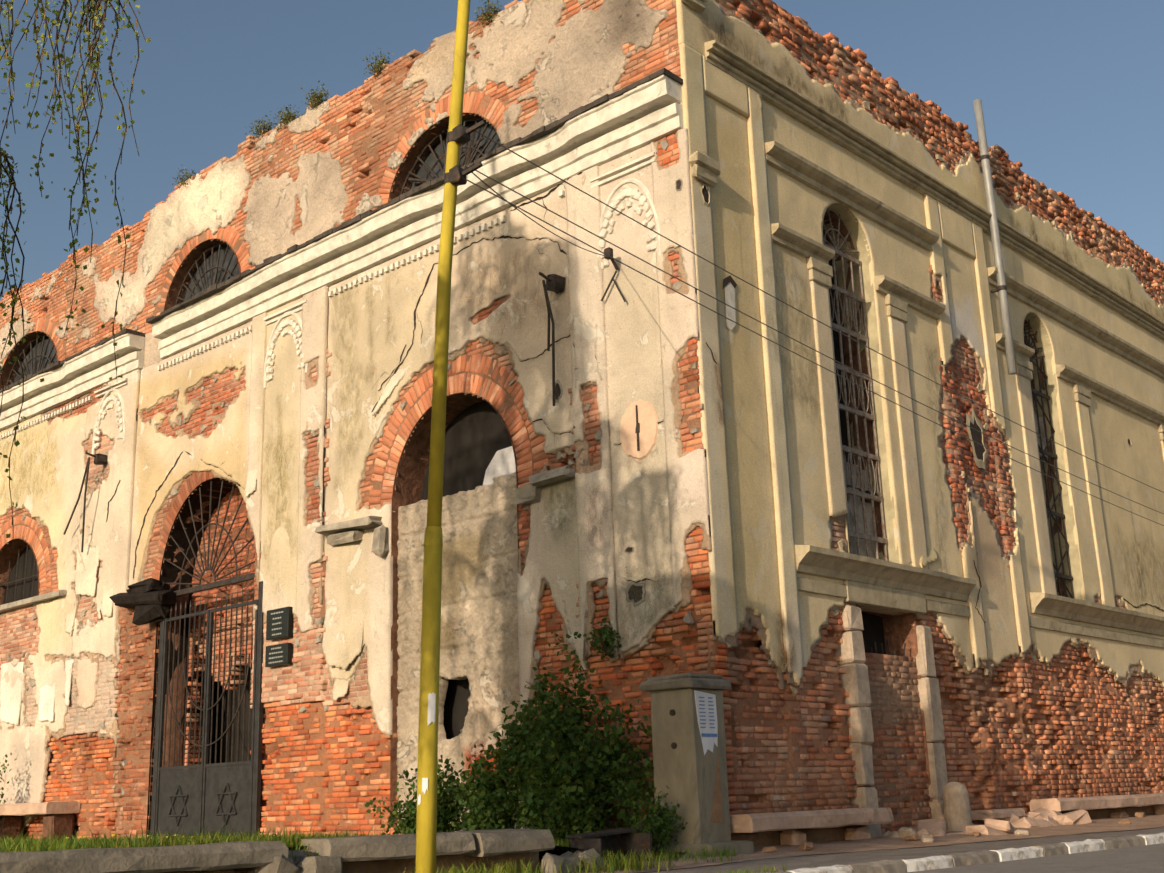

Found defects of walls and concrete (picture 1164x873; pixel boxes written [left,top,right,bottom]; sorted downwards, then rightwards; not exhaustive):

flaking render [137,368,246,438]
flaking render [0,0,604,361]
crack [371,171,583,412]
flaking render [614,0,681,92]
flaking render [655,132,680,168]
flaking render [675,338,704,452]
flaking render [715,0,1164,305]
flaking render [938,339,1016,568]
flaking render [0,507,170,840]
flaking render [247,552,404,873]
flaking render [532,526,863,833]
flaking render [898,612,1164,825]